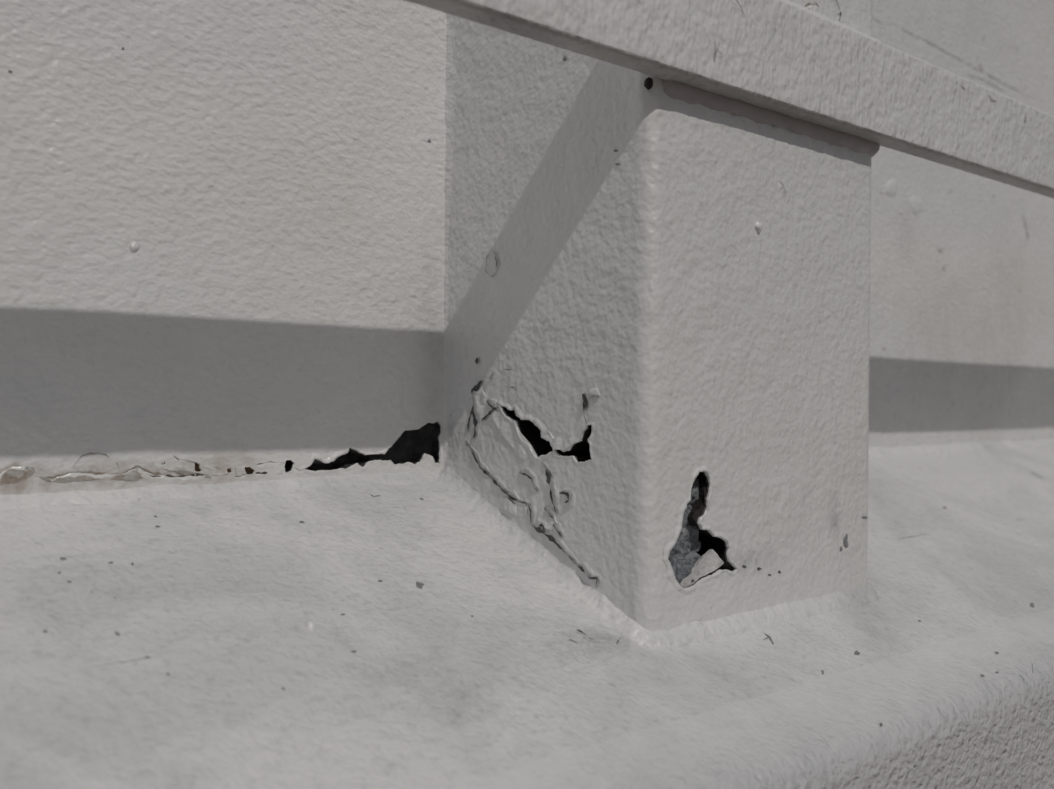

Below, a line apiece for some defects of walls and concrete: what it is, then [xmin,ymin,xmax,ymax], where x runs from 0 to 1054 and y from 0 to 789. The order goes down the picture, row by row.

peeling [0,452,167,485]
spalling [284,418,443,477]
crack [465,358,602,587]
spalling [497,400,594,465]
peeling [663,465,781,595]